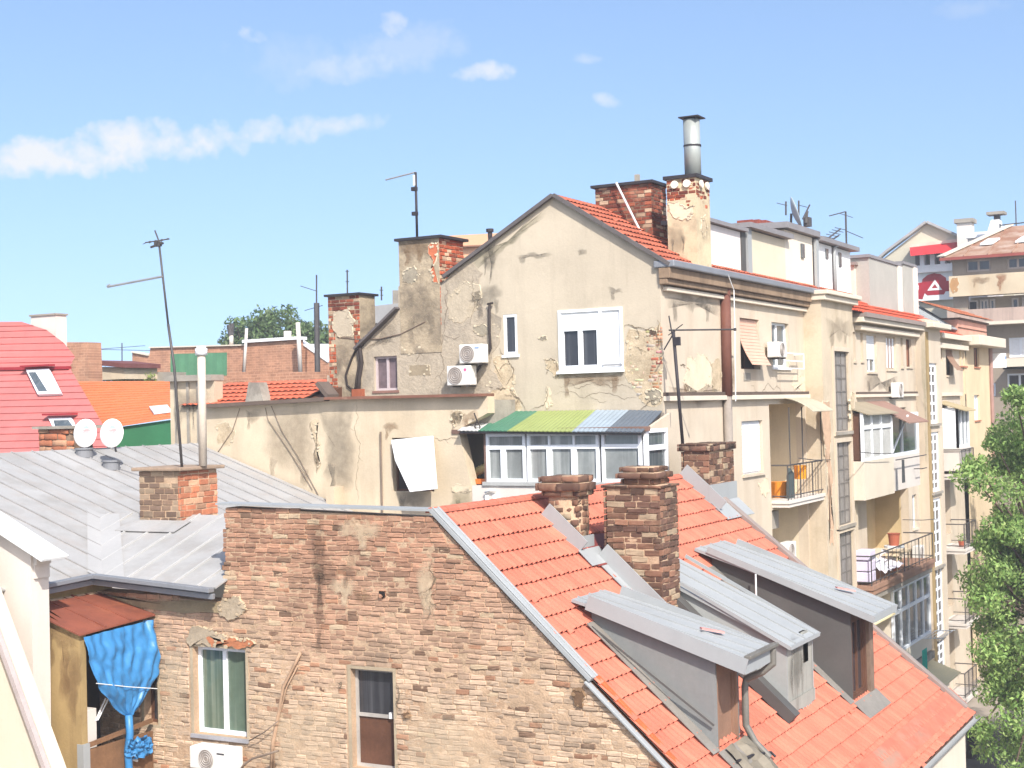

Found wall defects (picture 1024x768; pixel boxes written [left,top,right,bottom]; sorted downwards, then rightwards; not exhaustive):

spalling [666,201,708,238]
spalling [332,308,356,339]
spalling [486,354,523,411]
crack [490,353,654,410]
spalling [624,323,664,408]
spalling [683,353,722,392]
spalling [217,595,248,621]
spalling [186,625,257,650]